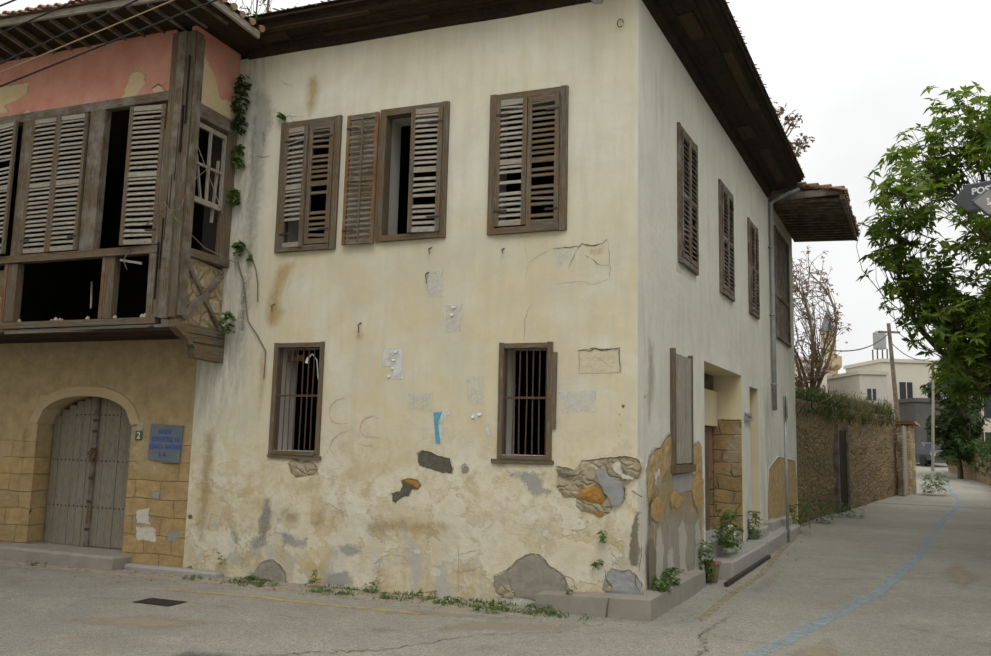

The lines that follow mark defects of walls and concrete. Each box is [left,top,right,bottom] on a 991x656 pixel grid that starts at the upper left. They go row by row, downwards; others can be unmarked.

peeling [0,81,31,114]
peeling [121,70,168,101]
crack [525,240,611,285]
flaking render [287,459,319,478]
flaking render [391,477,422,502]
flaking render [416,449,469,475]
flaking render [511,432,703,517]
flaking render [492,552,575,601]
flaking render [603,545,645,595]